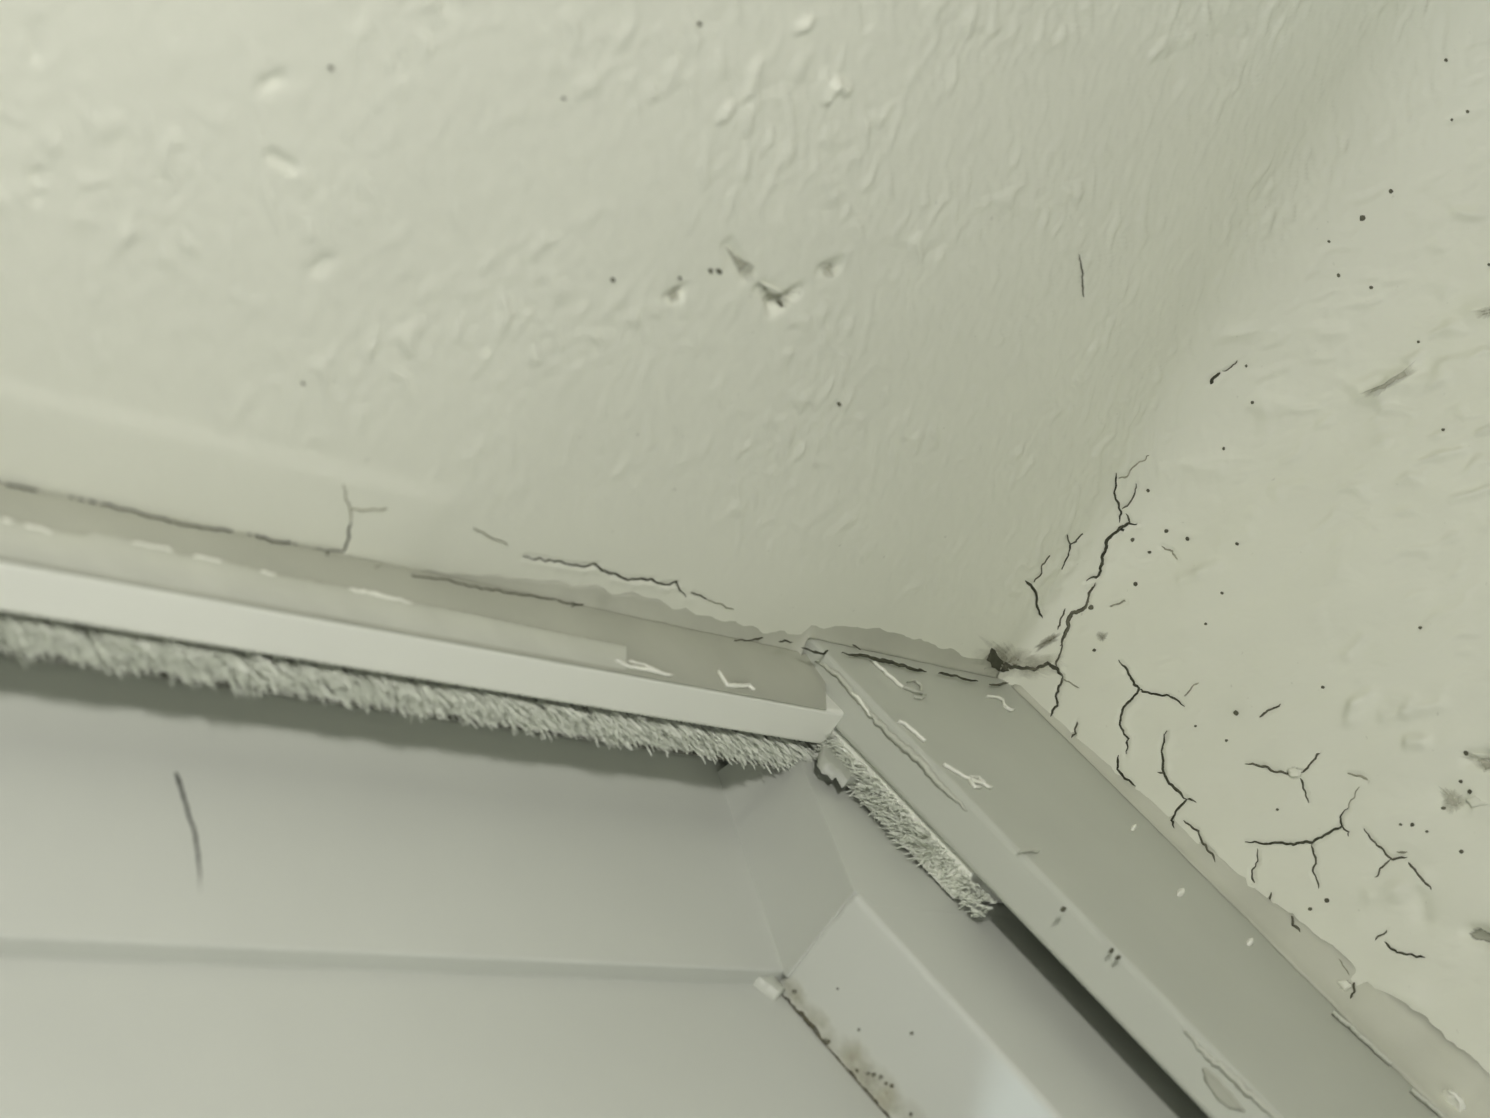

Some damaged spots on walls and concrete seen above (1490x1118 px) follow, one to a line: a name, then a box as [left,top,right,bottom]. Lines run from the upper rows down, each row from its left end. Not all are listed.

peeling [0,517,673,678]
crack [6,455,1177,738]
peeling [717,670,755,691]
peeling [816,659,993,811]
peeling [986,695,1015,712]
crack [1116,661,1431,932]
flaking render [1470,928,1490,942]
peeling [1331,1010,1392,1066]